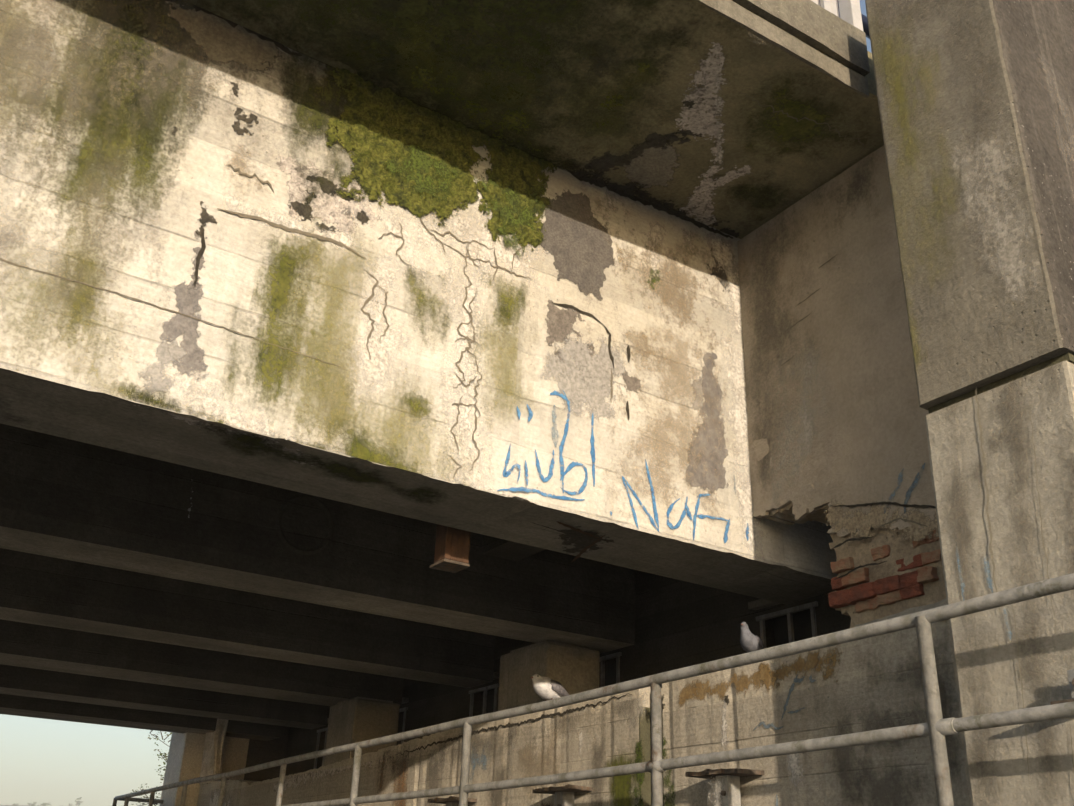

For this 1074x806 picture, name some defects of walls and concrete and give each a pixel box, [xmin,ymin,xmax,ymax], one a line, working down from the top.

crack [194,197,538,286]
peeling [539,190,615,301]
water stain [965,139,1040,289]
crack [0,258,348,370]
peeling [541,300,641,419]
spalling [822,501,942,613]
rust [378,754,409,806]
water stain [420,732,516,806]